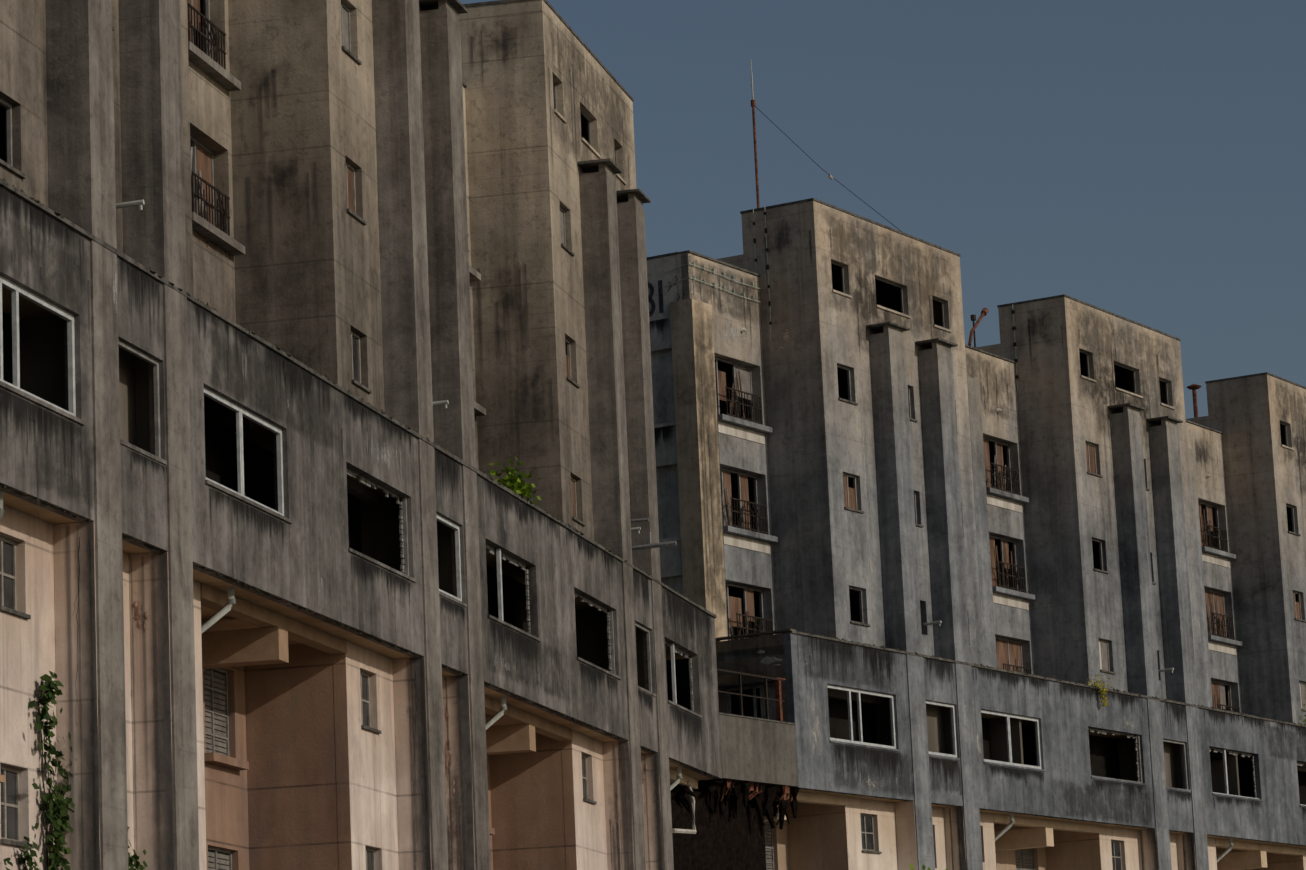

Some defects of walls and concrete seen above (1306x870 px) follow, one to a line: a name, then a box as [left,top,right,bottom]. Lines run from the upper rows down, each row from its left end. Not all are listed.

damp [0,186,78,243]
damp [195,304,410,440]
damp [654,426,672,443]
damp [485,480,615,565]
damp [81,522,100,870]
damp [155,552,175,870]
damp [978,668,1138,706]
damp [1208,710,1306,734]
damp [835,744,899,786]
damp [930,757,957,779]
damp [989,765,1042,780]
damp [956,807,967,870]